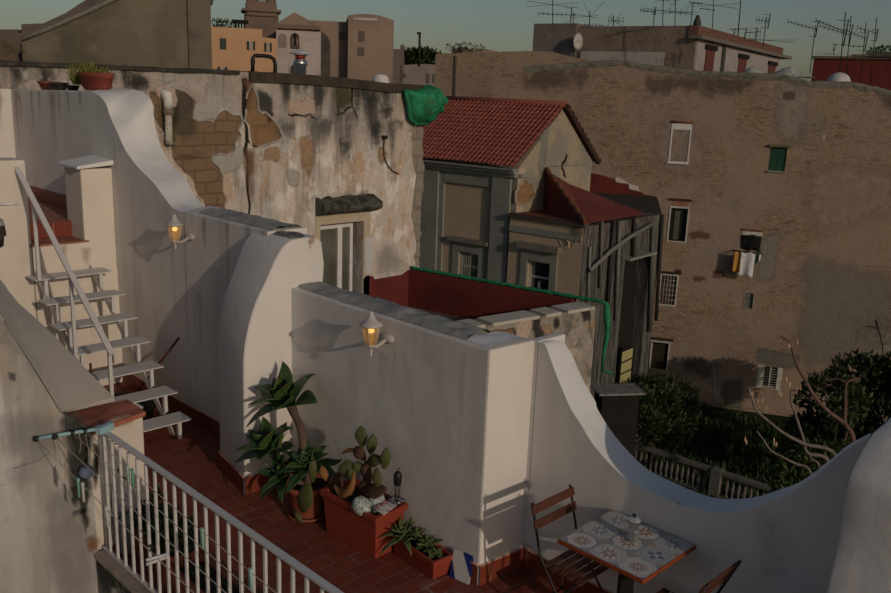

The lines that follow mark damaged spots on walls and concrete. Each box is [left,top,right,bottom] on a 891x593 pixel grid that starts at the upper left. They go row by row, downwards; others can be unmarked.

water stain [258,90,273,121]
water stain [281,83,325,106]
crack [288,88,357,119]
water stain [355,89,402,138]
flaking render [149,85,285,209]
crack [242,78,257,214]
water stain [300,120,331,173]
crack [548,154,580,177]
flaking render [515,178,539,208]
water stain [62,412,99,528]
water stain [97,561,129,593]